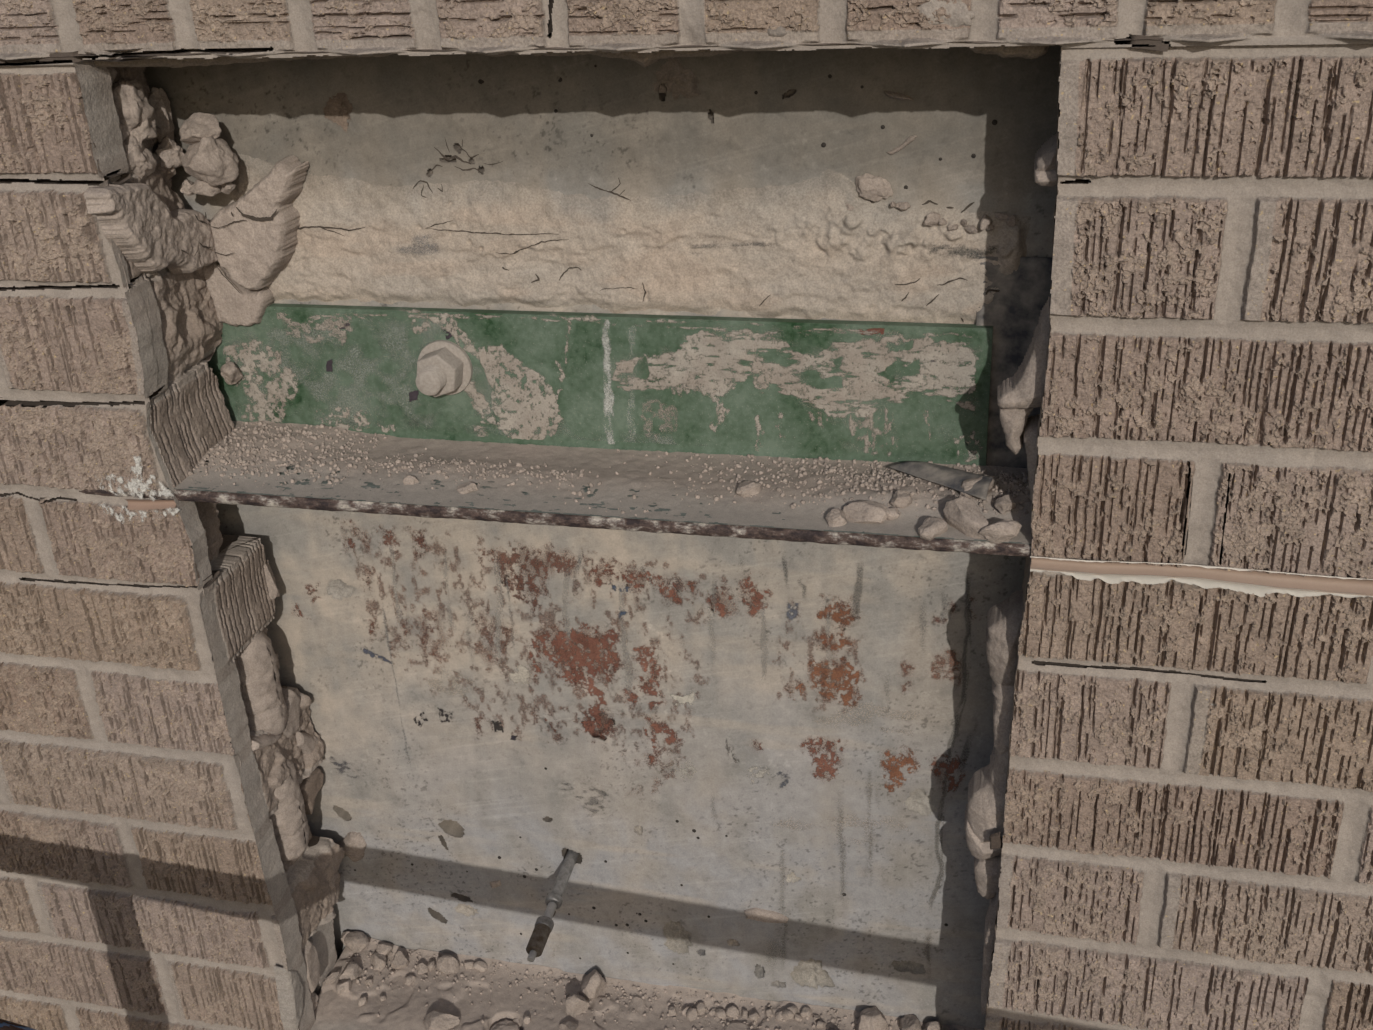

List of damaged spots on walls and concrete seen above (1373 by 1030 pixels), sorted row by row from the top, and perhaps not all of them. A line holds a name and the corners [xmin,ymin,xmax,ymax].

crack [546,0,554,34]
crack [0,172,131,186]
spalling [84,155,309,327]
corrosion [341,520,771,792]
corrosion [773,596,865,711]
corrosion [931,650,961,682]
crack [1033,660,1263,683]
corrosion [801,738,843,780]
corrosion [881,749,965,792]